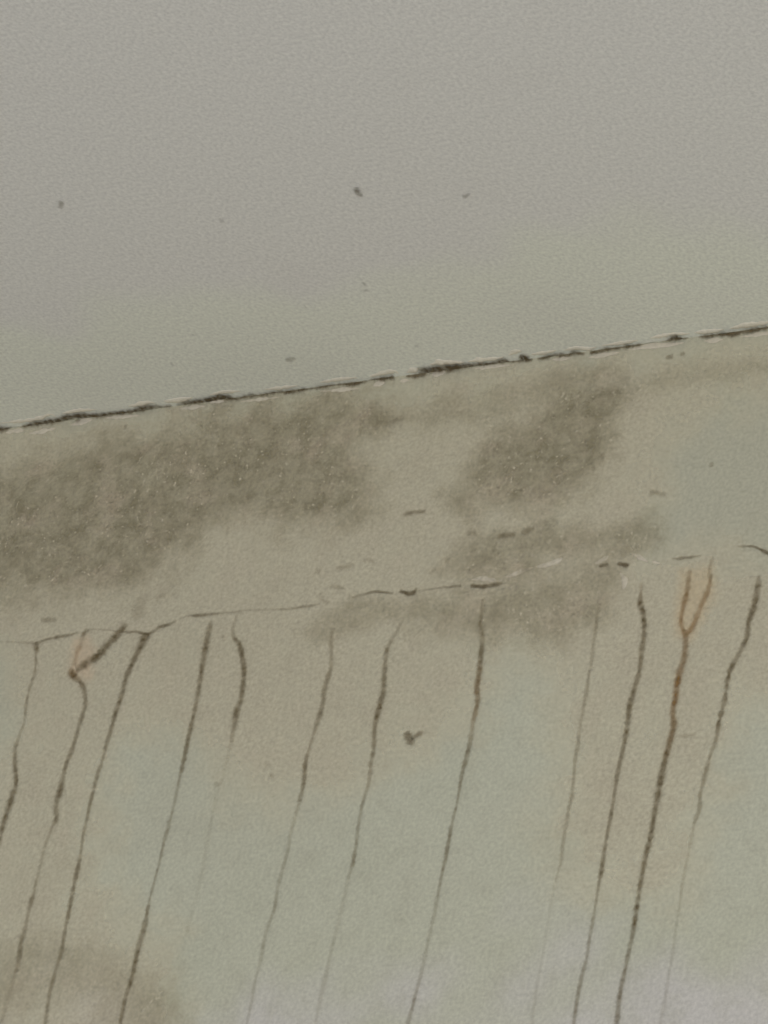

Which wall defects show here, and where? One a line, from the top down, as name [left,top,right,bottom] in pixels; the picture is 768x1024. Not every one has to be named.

crack [0,321,768,434]
leakage [0,369,662,770]
crack [469,557,563,588]
crack [595,553,661,590]
leakage [577,592,685,743]
leakage [668,585,768,756]
leakage [585,756,647,836]
corrosion [632,619,686,928]